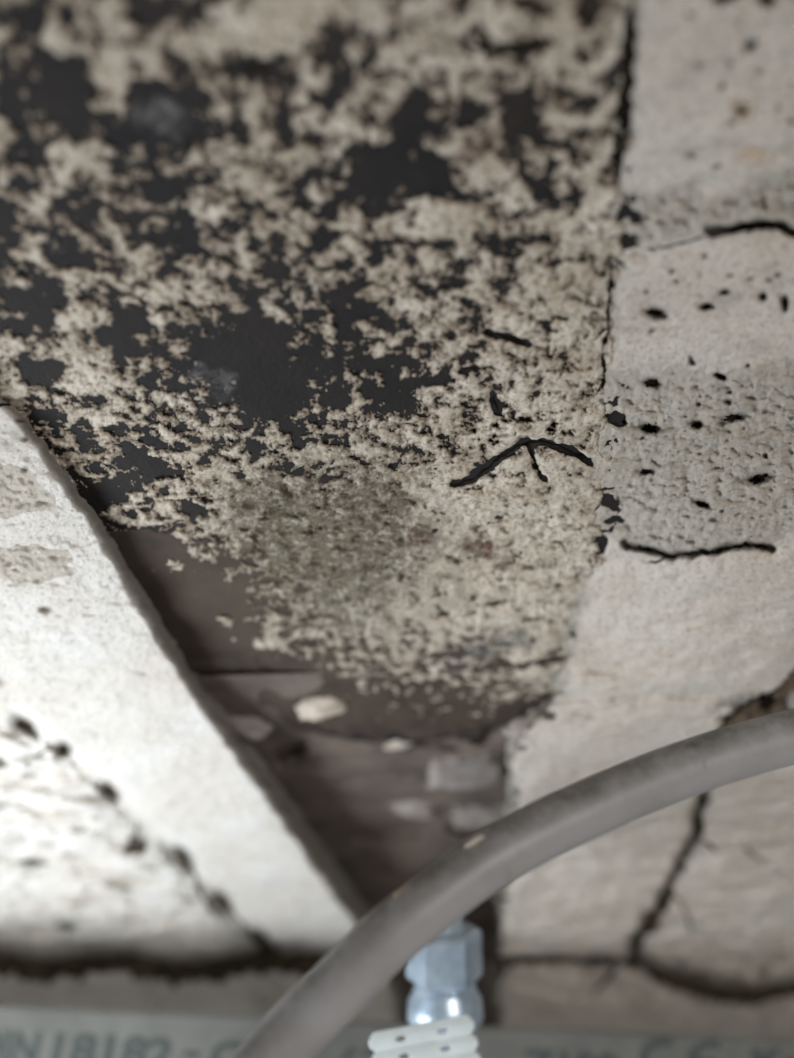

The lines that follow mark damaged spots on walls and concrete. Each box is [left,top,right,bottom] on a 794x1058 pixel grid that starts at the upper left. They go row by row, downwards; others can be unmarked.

crack [657,221,794,248]
peeling [131,303,224,360]
peeling [287,282,355,359]
crack [456,439,587,485]
spalling [595,356,794,556]
spalling [0,463,59,519]
spalling [0,544,78,585]
crack [635,536,769,564]
peeling [107,524,566,741]
crack [123,822,139,857]
crack [0,863,326,989]
crack [500,793,794,1008]